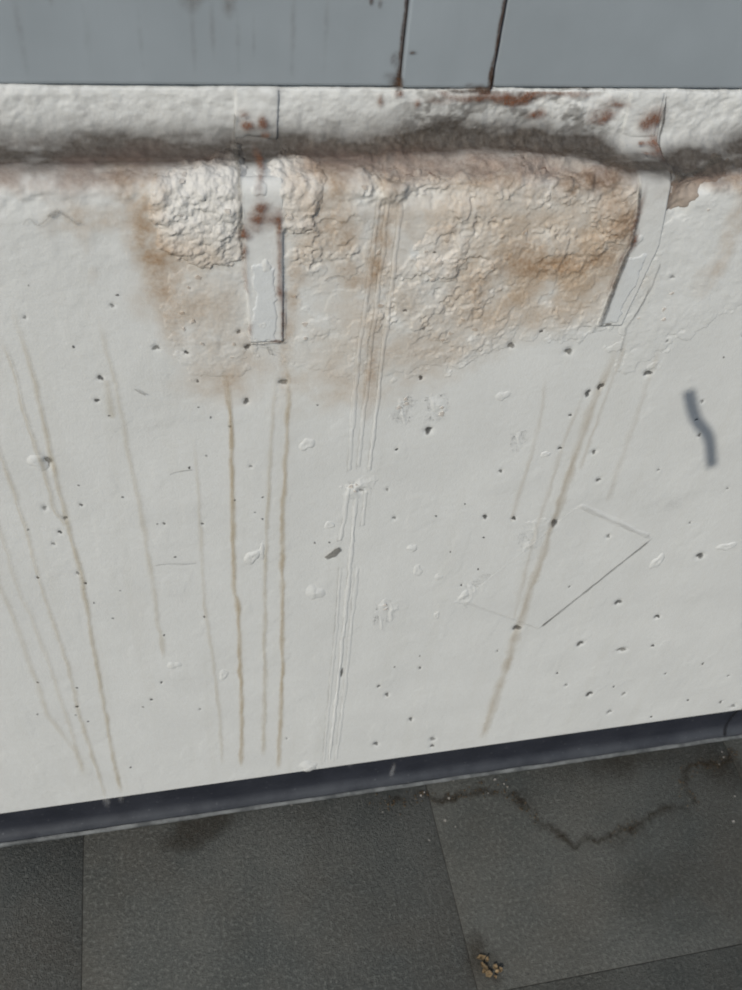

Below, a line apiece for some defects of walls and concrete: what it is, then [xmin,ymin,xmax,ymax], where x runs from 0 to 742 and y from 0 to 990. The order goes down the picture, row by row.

rust [641,113,660,129]